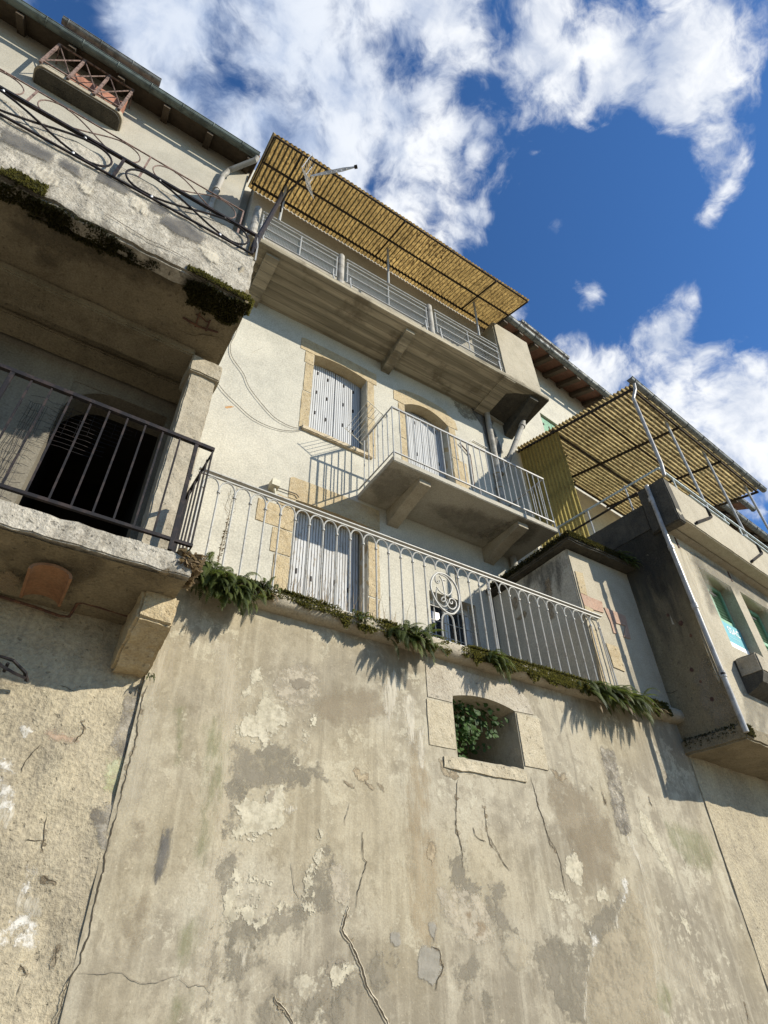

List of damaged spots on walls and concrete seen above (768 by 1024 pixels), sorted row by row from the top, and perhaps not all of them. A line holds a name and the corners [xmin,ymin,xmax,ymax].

peeling [233,664,321,751]
crack [18,685,211,1024]
peeling [221,865,288,931]
peeling [227,784,293,845]
peeling [302,829,352,915]
crack [340,803,390,1024]
crack [454,781,509,870]
crack [531,780,565,886]